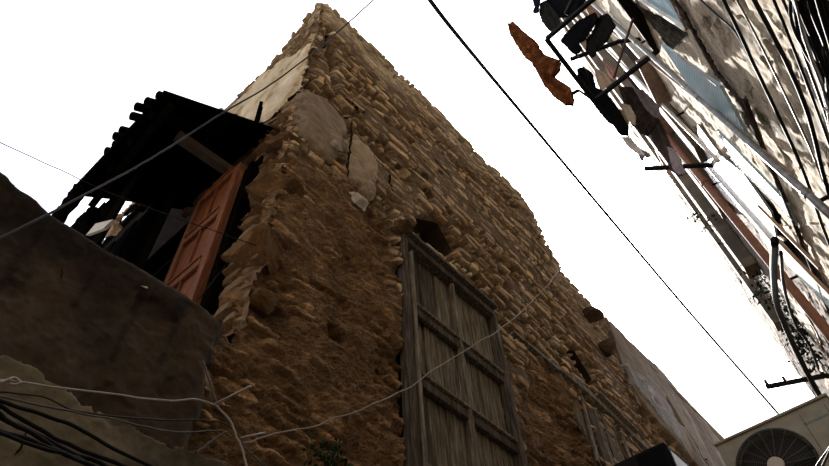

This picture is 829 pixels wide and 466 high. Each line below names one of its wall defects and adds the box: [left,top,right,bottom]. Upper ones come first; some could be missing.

spalling [224,3,324,112]
crack [328,94,364,186]
spalling [0,90,406,466]
spalling [519,362,597,466]